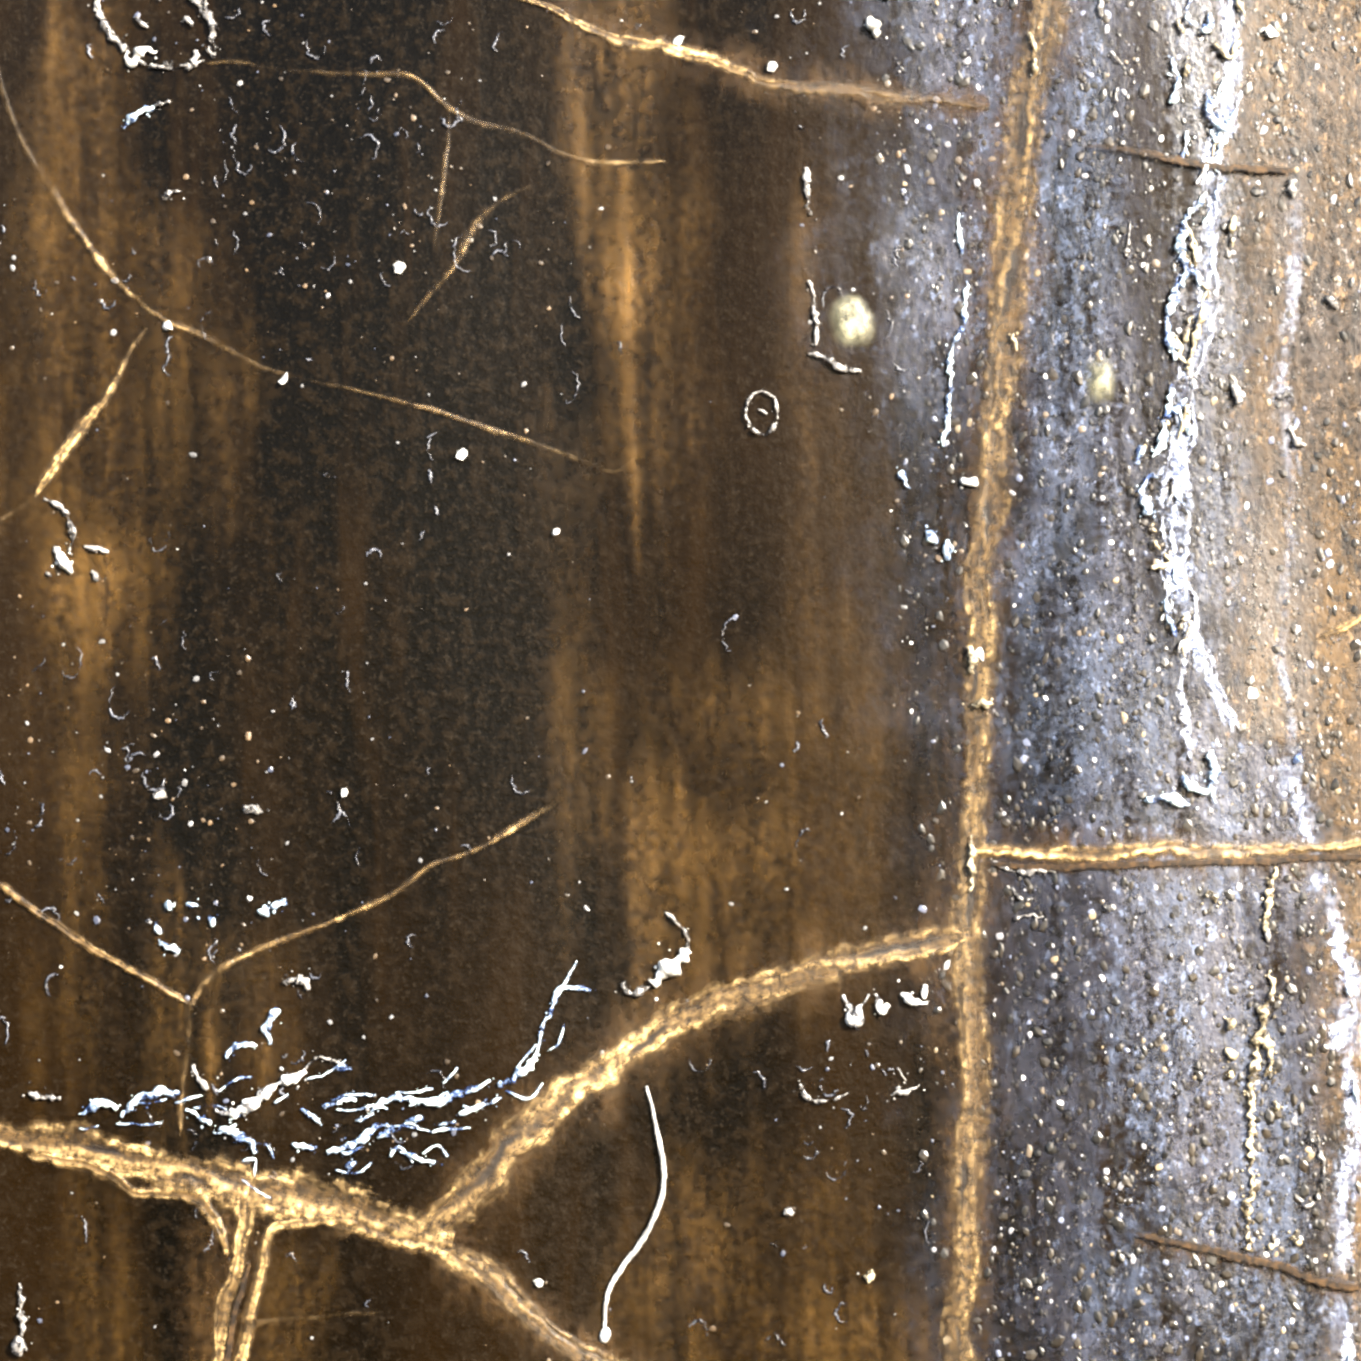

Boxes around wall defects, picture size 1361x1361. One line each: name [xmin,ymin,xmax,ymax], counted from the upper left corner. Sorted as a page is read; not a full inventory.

crack [408,74,438,98]
crack [528,0,990,111]
crack [583,157,660,165]
water stain [886,0,1030,356]
crack [66,214,128,292]
crack [156,314,198,334]
crack [35,354,129,497]
crack [420,406,507,435]
crack [948,0,1361,1361]
water stain [985,0,1361,1361]
crack [0,820,529,1005]
crack [0,925,969,1361]